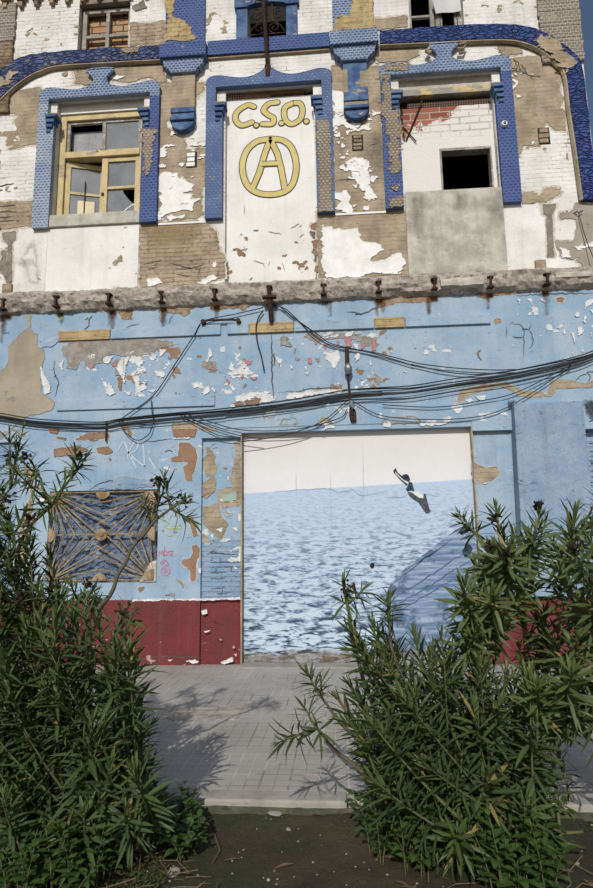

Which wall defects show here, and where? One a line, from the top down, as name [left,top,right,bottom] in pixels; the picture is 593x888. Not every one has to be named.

peeling [121,0,196,54]
peeling [332,0,411,31]
peeling [109,64,259,288]
peeling [277,45,421,279]
peeling [0,186,33,283]
peeling [519,185,593,267]
peeling [40,366,51,395]
rust [200,305,241,325]
peeling [58,330,393,430]
spalling [379,379,593,427]
crack [506,322,534,357]
peeling [131,422,241,615]